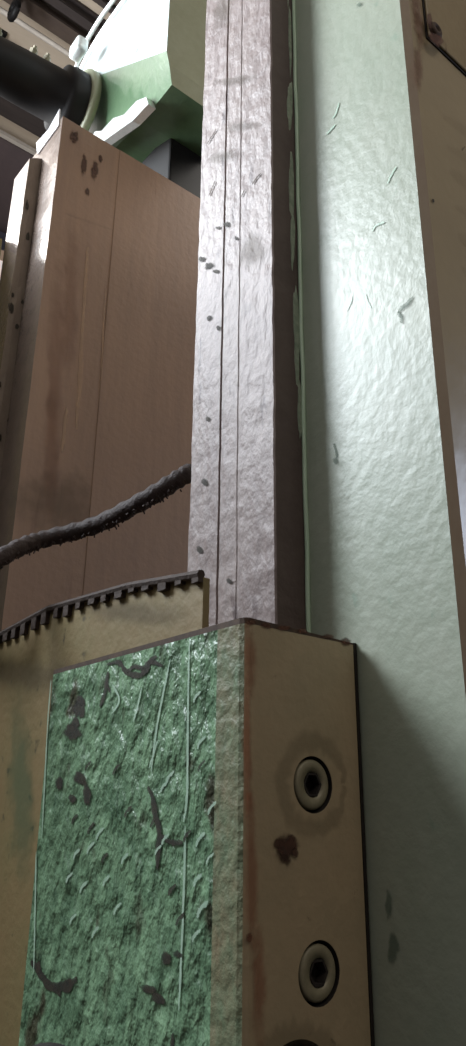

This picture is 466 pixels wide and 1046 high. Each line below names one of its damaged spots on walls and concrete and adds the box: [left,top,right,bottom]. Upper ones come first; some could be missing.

peeling [107,656,163,679]
peeling [64,696,85,739]
peeling [56,761,91,824]
peeling [66,823,104,883]
peeling [175,901,208,942]
peeling [162,950,183,964]
peeling [31,960,77,997]
peeling [141,985,165,1004]